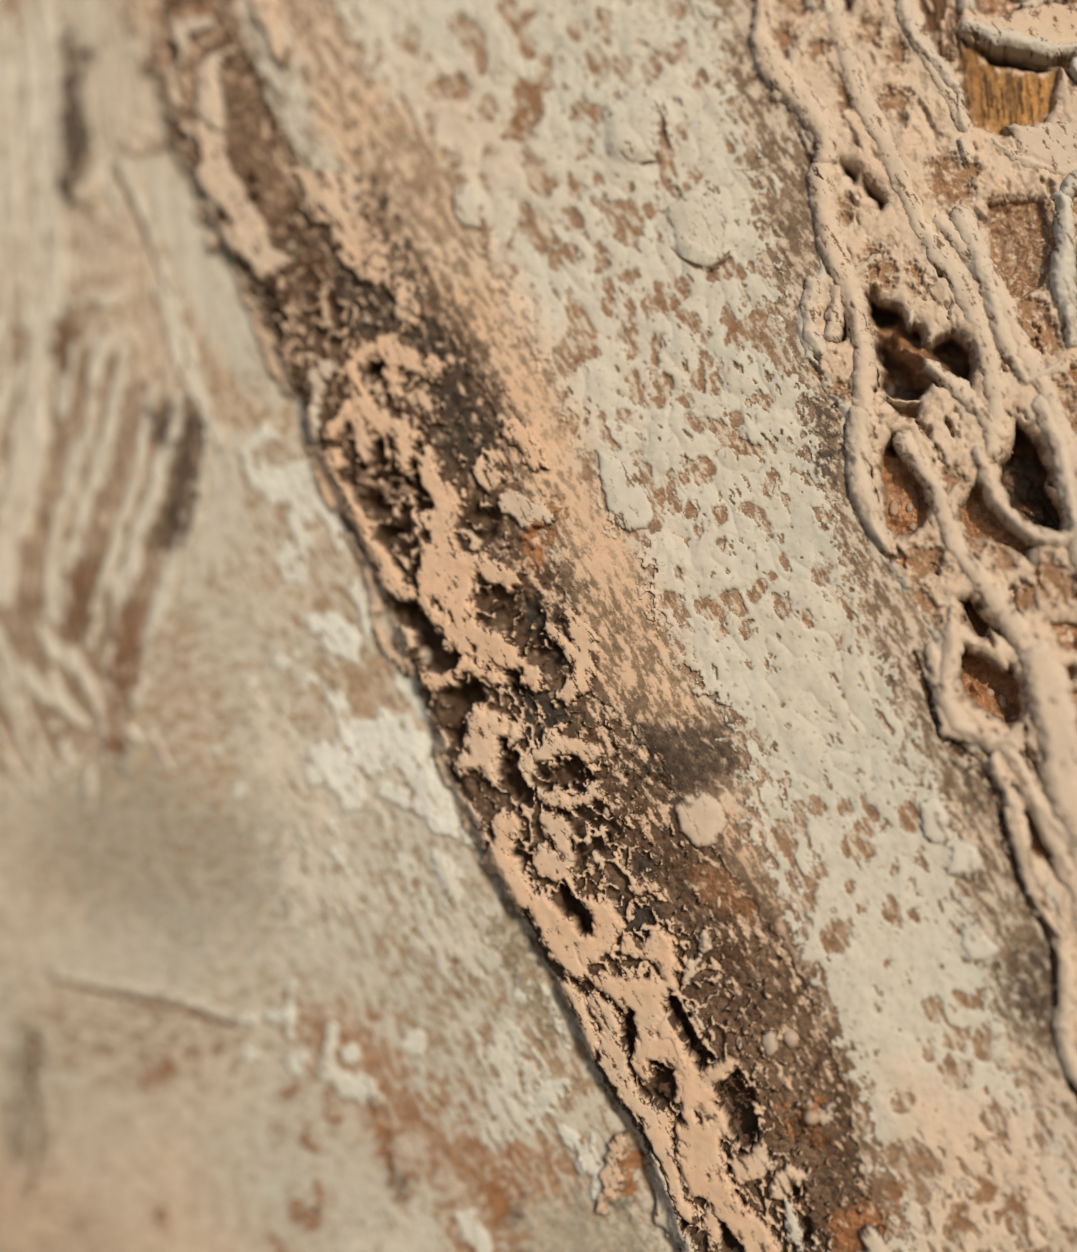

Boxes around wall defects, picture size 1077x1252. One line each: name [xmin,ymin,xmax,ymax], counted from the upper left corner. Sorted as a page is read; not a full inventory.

spalling [138,0,892,1252]
spalling [744,0,1077,1086]
peeling [865,1158,906,1185]